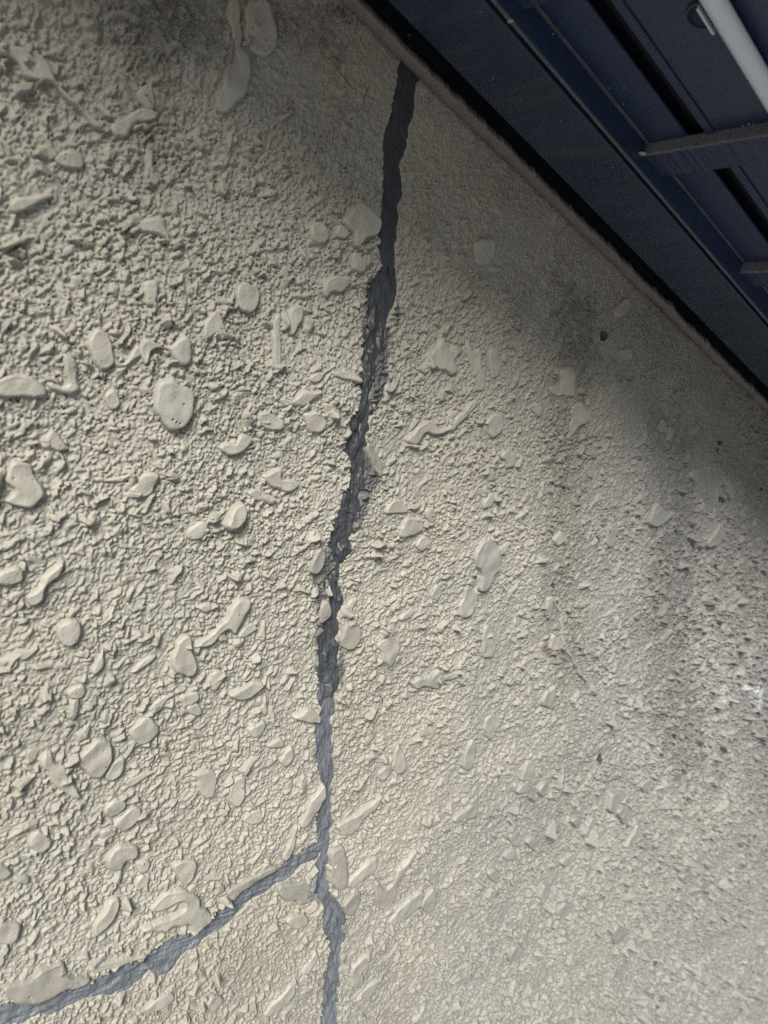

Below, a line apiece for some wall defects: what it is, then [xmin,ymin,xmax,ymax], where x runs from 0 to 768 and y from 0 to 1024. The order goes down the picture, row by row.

crack [0,61,420,1024]